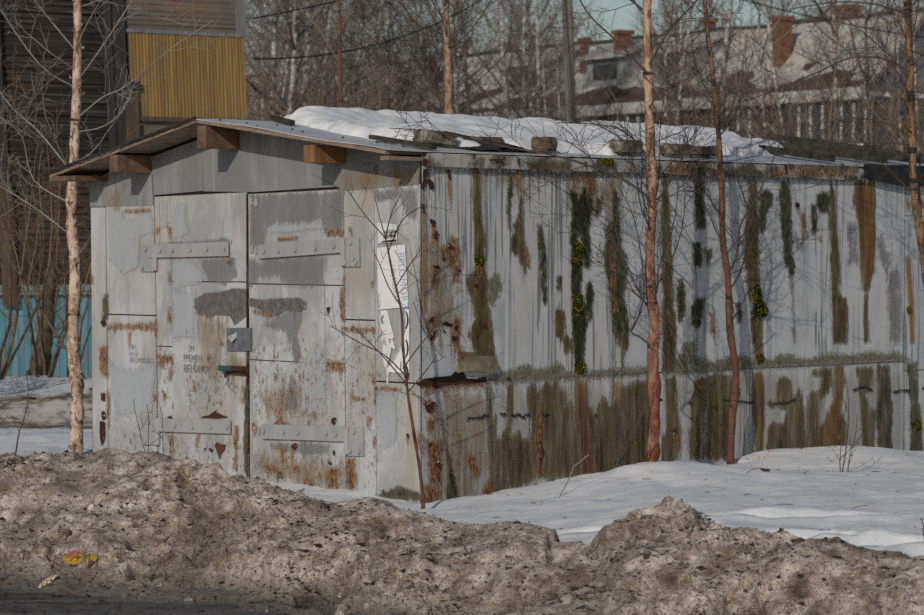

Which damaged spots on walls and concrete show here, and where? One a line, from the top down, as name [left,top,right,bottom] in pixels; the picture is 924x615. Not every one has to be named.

rust [420,213,467,363]
damp [847,222,859,264]
rust [167,274,400,472]
rust [252,446,373,489]